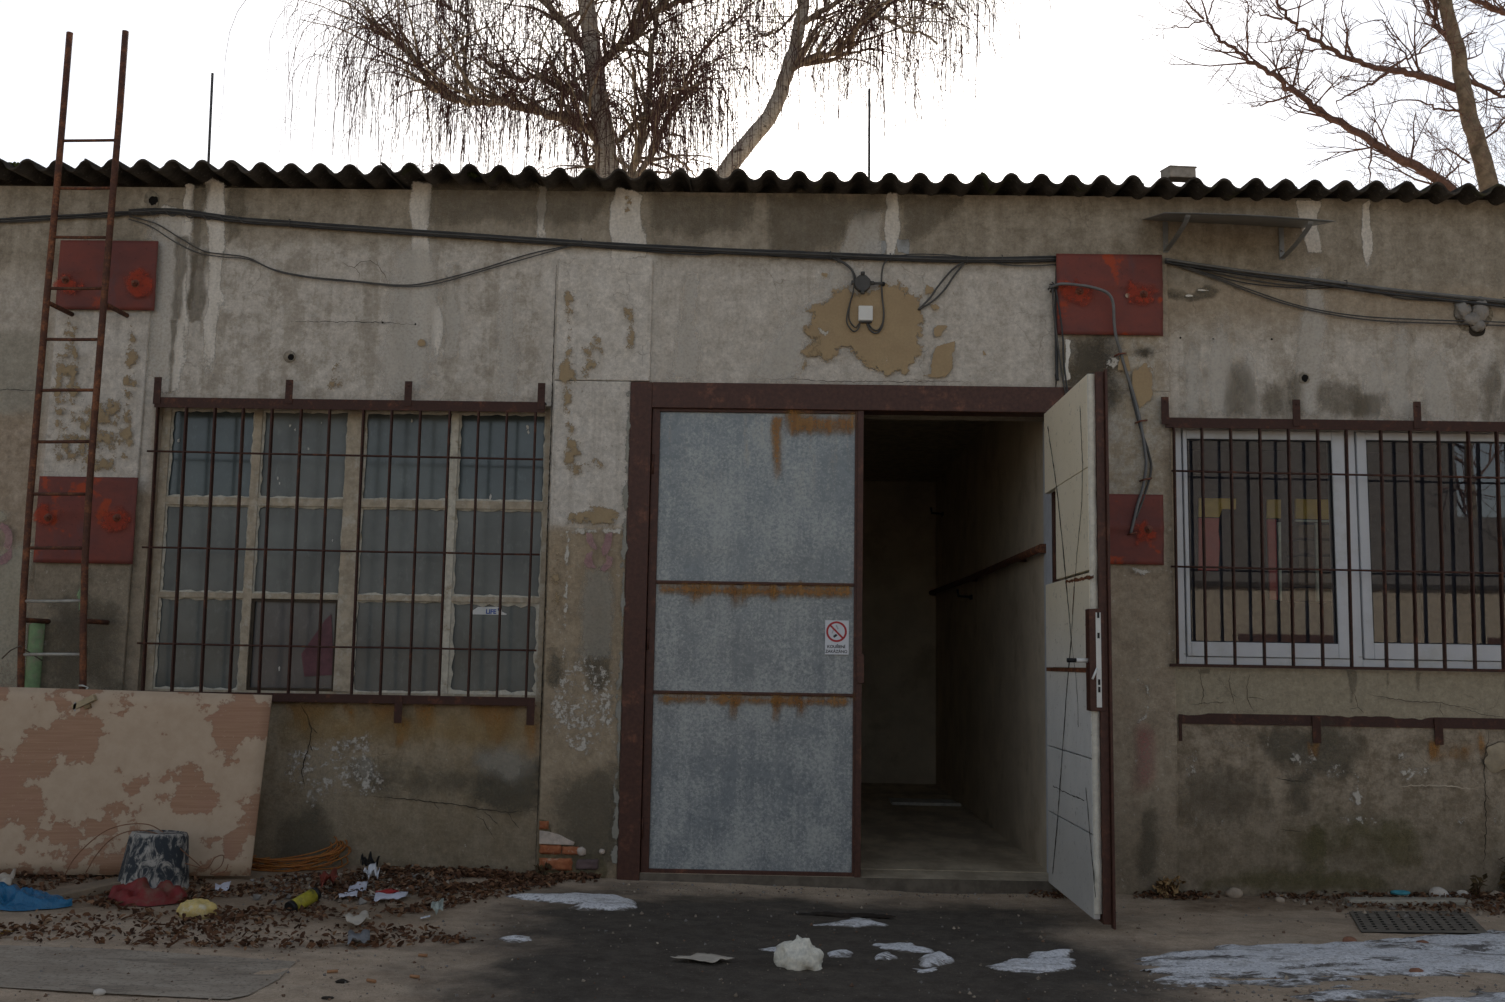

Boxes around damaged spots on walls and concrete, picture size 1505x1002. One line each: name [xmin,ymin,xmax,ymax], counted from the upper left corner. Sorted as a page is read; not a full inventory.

water stain [536,186,547,238]
efflorescence [609,188,647,259]
peeling [623,307,635,349]
peeling [798,272,955,378]
peeling [51,317,139,472]
peeling [559,291,604,475]
corrosion [771,410,855,468]
corrosion [660,582,851,601]
corrosion [660,693,848,718]
water stain [1267,726,1356,811]